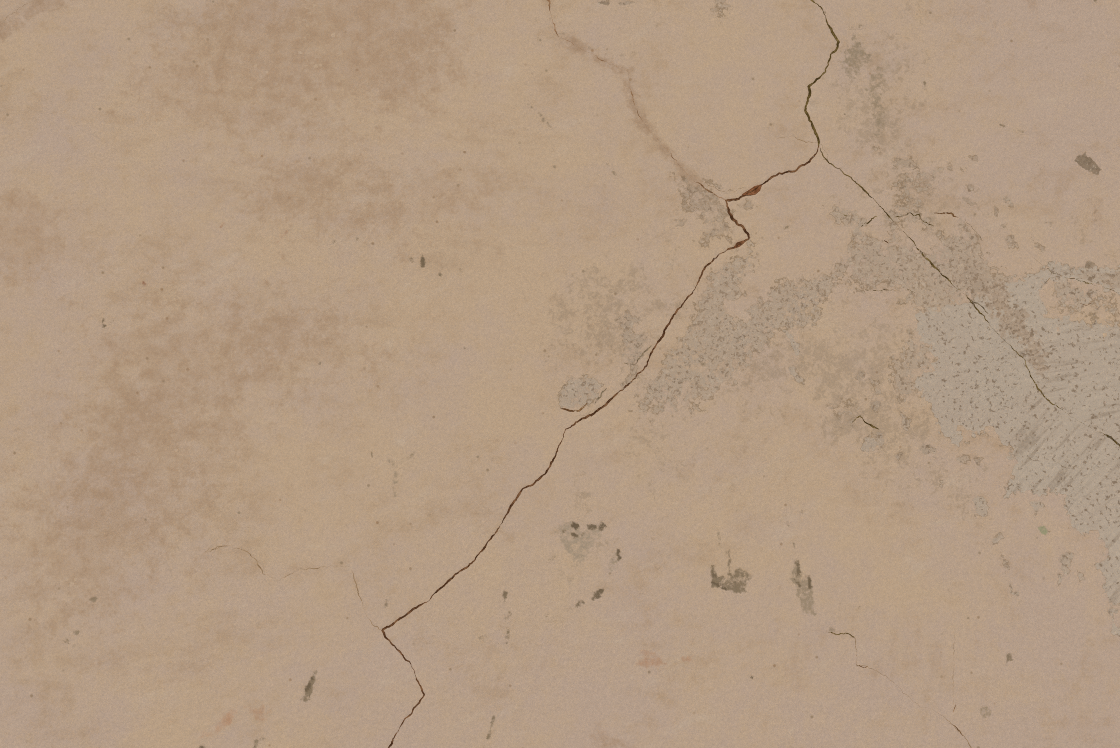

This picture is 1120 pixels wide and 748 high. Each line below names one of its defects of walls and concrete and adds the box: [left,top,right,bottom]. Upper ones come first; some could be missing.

crack [205,545,265,575]
crack [284,0,1120,748]
peeling [553,140,1120,619]